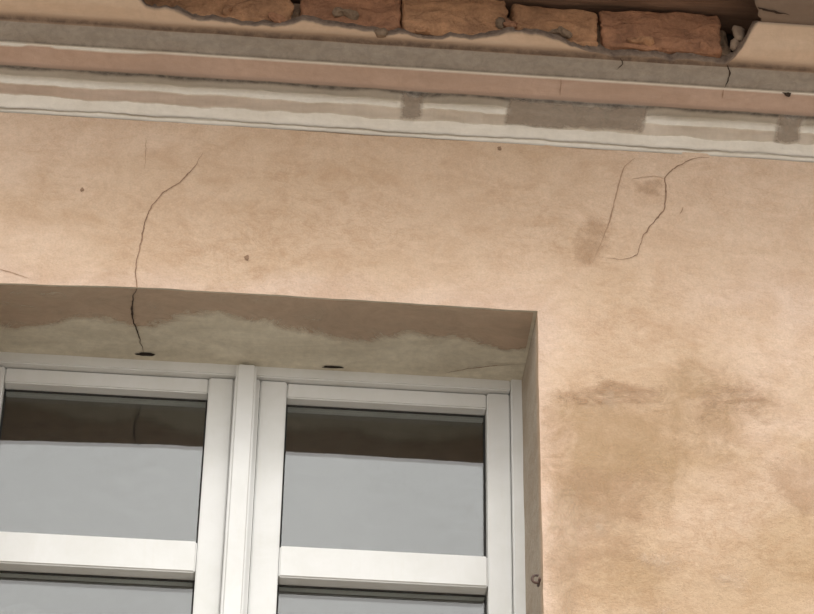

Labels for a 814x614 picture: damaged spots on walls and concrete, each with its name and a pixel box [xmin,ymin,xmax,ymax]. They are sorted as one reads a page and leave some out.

flaking render [144,0,745,58]
crack [131,155,202,352]
crack [593,157,708,261]